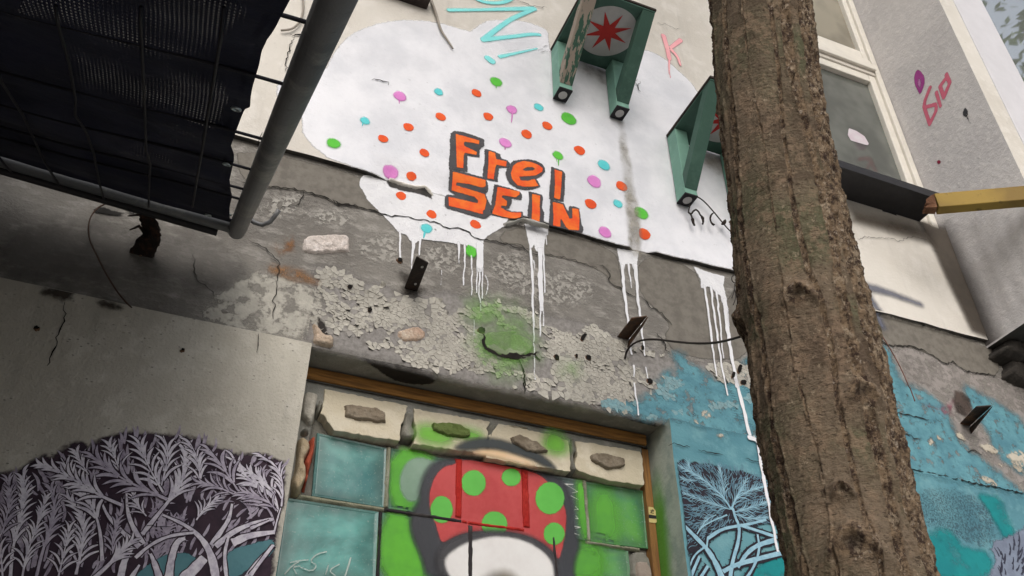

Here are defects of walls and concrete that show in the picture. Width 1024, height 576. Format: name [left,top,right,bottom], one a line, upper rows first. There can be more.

crack [47,303,67,366]
crack [243,182,672,352]
peeling [302,208,752,426]
peeling [980,443,1024,473]